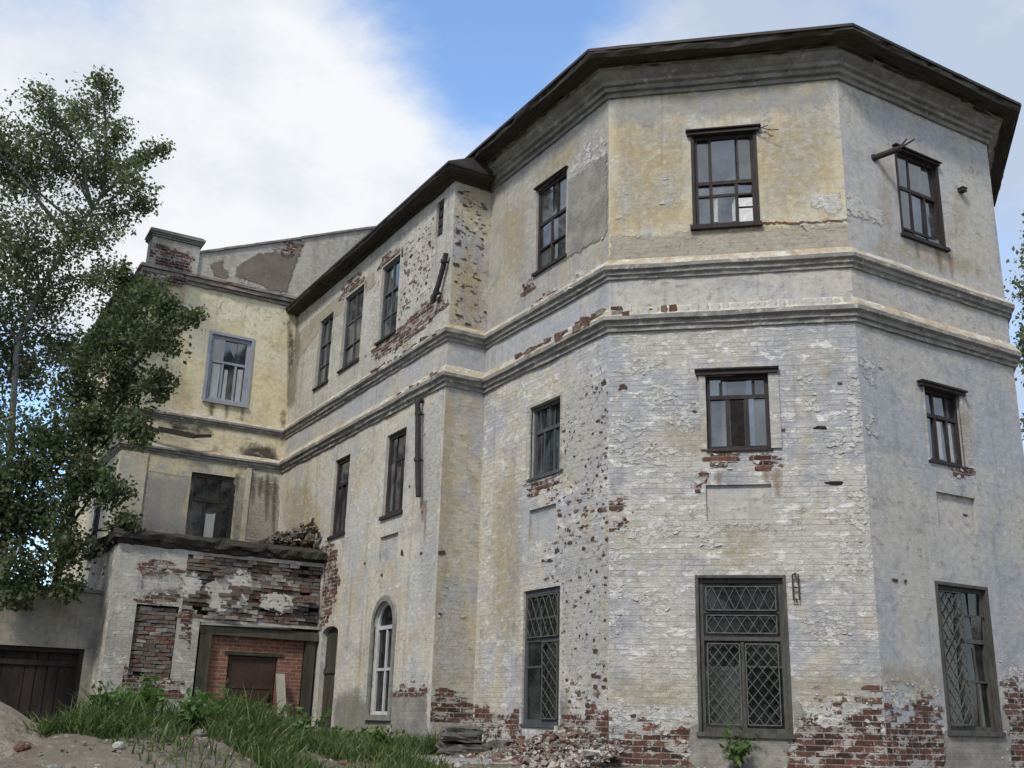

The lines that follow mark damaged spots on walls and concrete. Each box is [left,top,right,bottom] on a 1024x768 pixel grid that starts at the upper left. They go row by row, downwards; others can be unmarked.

spalling [262,240,304,260]
peeling [294,190,490,363]
spalling [690,448,784,493]
spalling [133,559,194,649]
spalling [319,540,340,631]
peeling [523,354,697,767]
flaking render [392,680,525,743]
flaking render [784,677,946,768]
flaking render [999,658,1024,768]